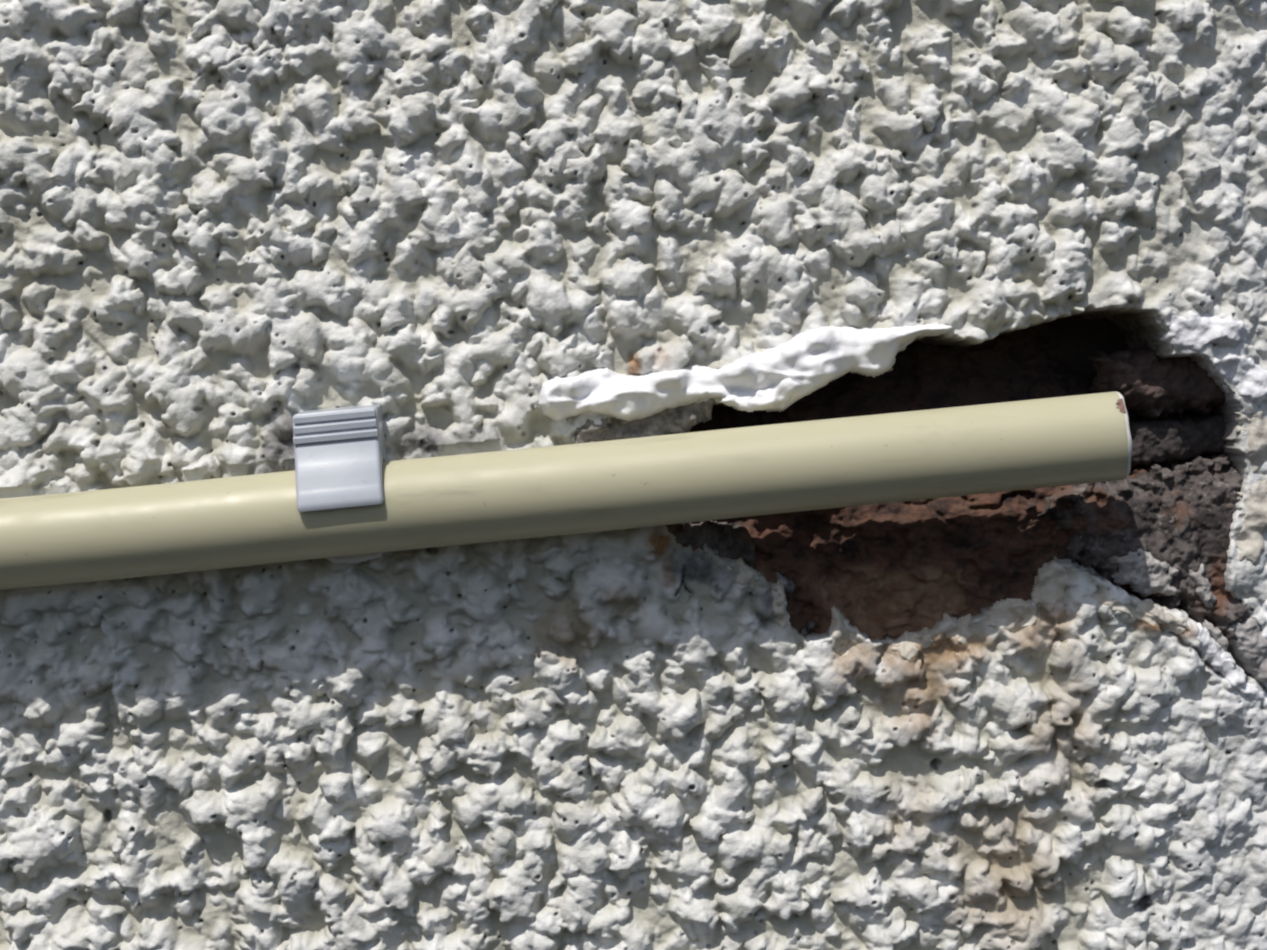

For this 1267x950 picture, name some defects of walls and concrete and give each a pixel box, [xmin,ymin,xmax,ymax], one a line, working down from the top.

spalling [573,311,1267,707]